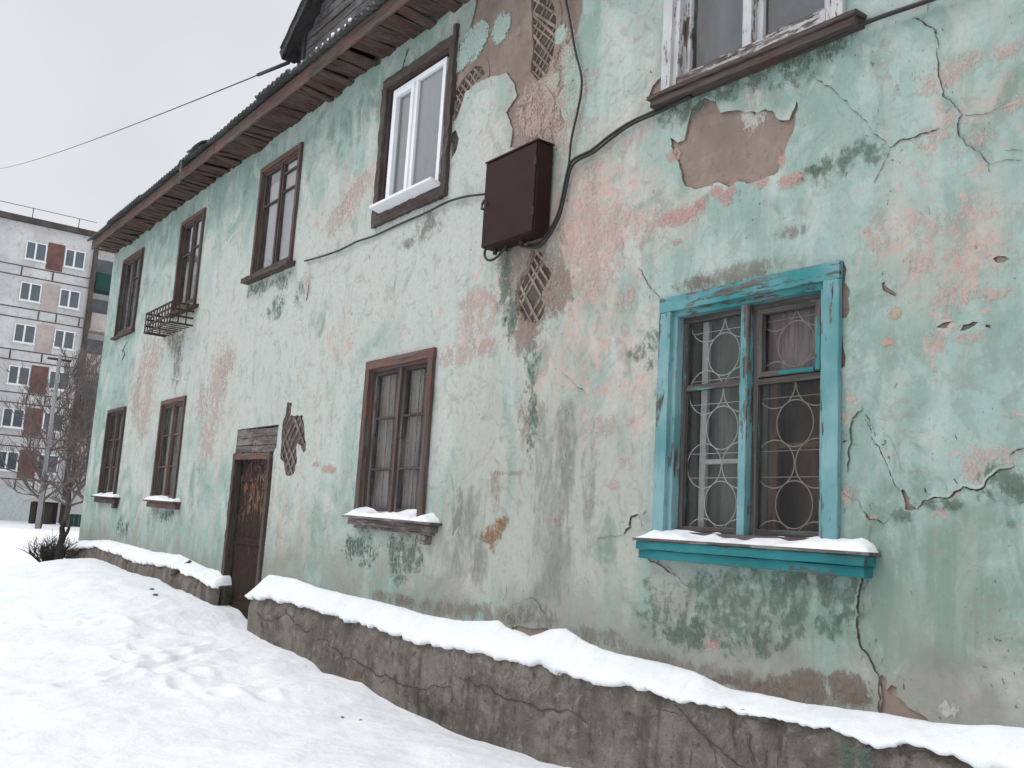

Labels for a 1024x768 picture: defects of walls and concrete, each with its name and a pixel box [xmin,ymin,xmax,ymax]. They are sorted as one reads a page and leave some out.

flaking render [450,0,599,166]
crack [810,3,1021,183]
flaking render [658,91,806,245]
flaking render [516,248,554,329]
peeling [906,204,1021,351]
flaking render [277,395,335,484]
crack [841,401,1024,553]
damp [346,530,423,604]
crack [256,612,590,753]
damp [637,569,868,658]
flaking render [713,664,943,723]
crack [847,577,881,713]